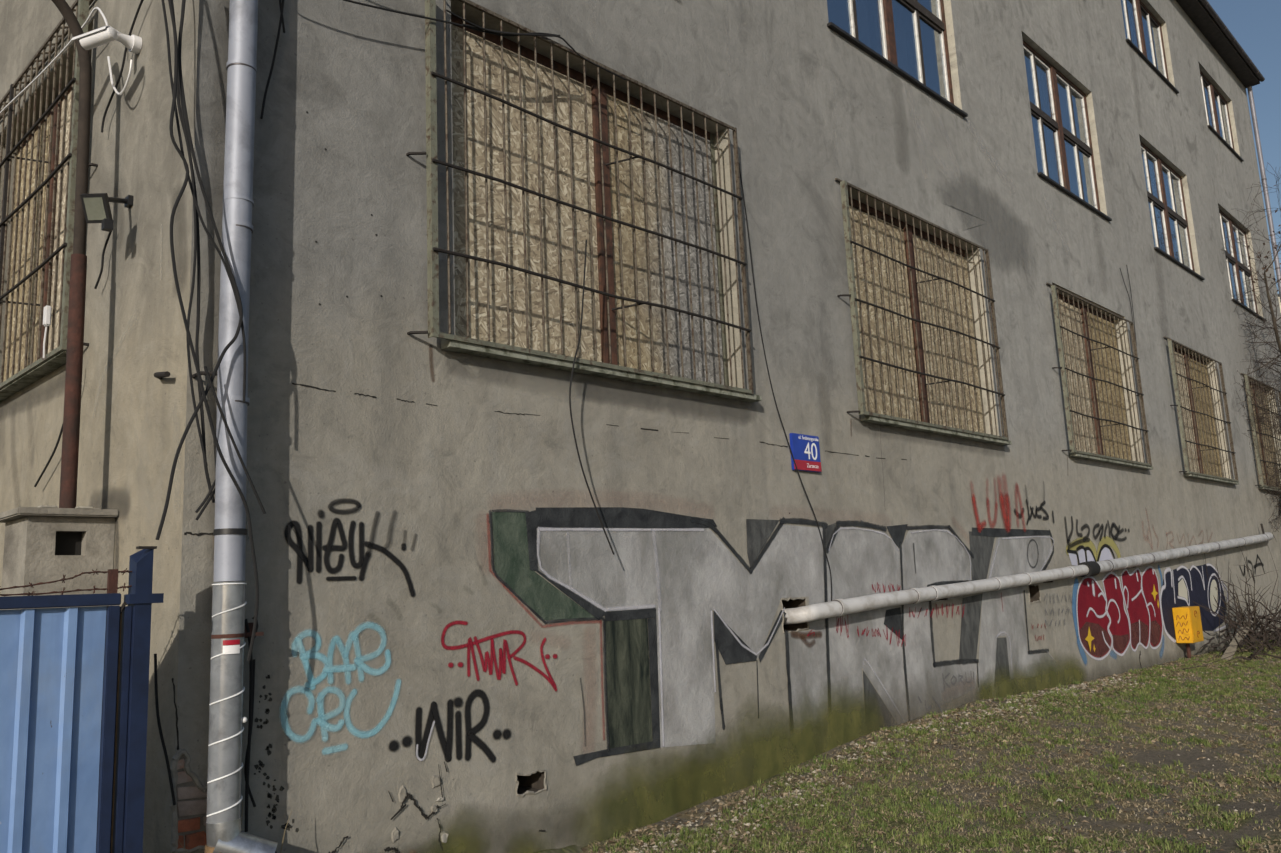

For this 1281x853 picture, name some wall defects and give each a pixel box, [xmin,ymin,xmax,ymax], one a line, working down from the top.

spalling [169,749,207,853]
crack [384,762,448,853]
spalling [515,769,547,798]